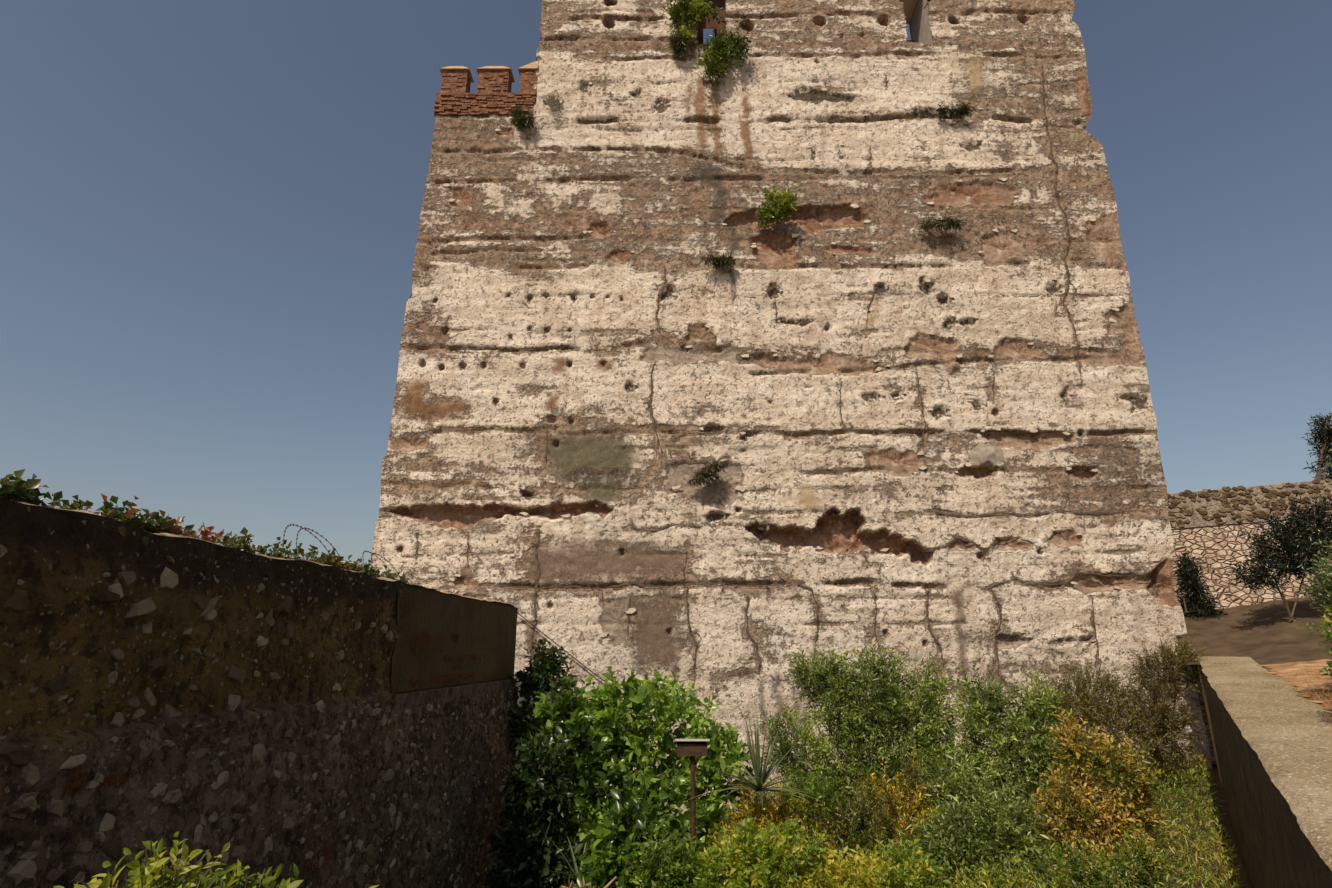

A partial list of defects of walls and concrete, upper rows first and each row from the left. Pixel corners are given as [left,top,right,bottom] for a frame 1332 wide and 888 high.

spalling [722,204,873,299]
crack [1024,64,1085,381]
crack [647,265,721,459]
crack [870,590,881,651]
spalling [745,504,1083,566]
crack [926,510,1167,683]
spalling [1066,558,1181,607]